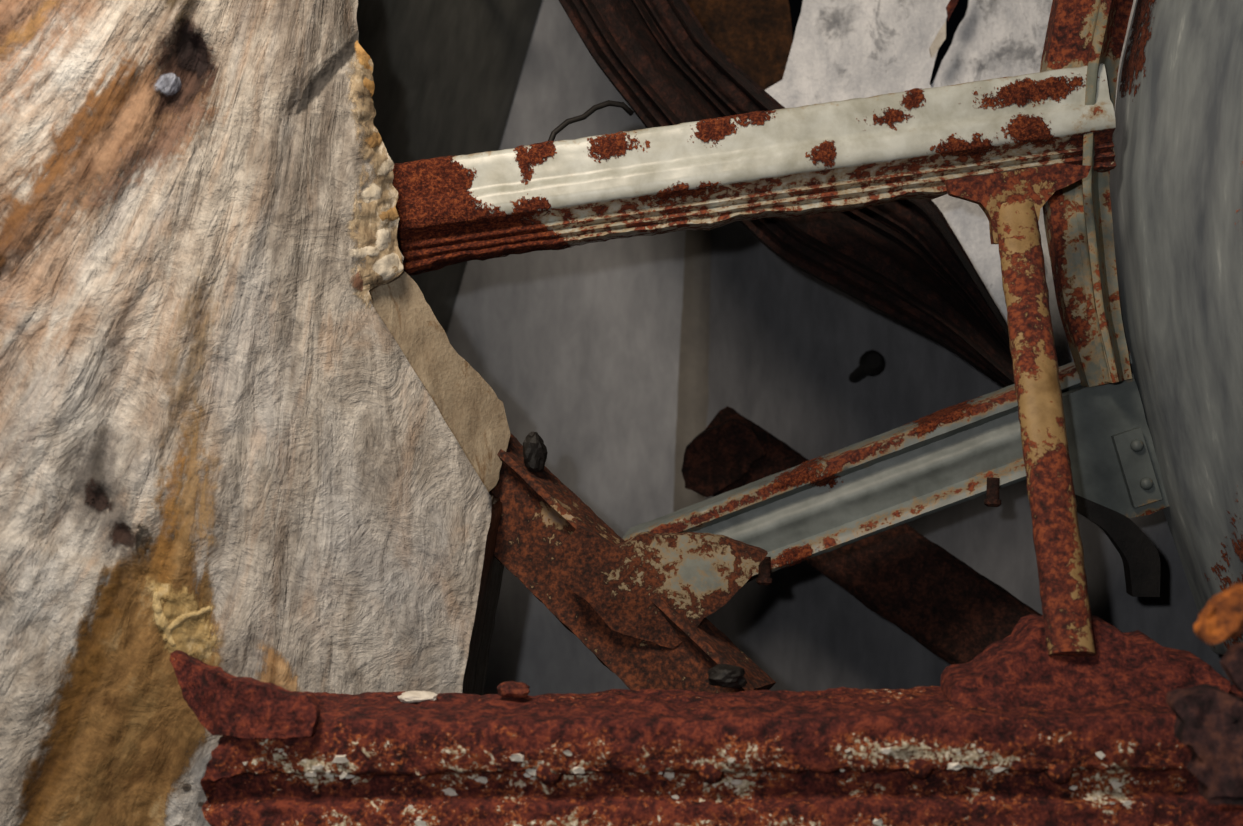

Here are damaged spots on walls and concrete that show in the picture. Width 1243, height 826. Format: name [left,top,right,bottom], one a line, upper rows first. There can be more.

corrosion [1119,0,1156,102]
corrosion [587,131,650,163]
corrosion [690,110,777,147]
corrosion [805,140,837,170]
corrosion [856,88,926,131]
corrosion [924,73,1103,160]
corrosion [392,141,571,276]
corrosion [624,181,723,212]
corrosion [899,396,980,435]
corrosion [759,454,843,492]
corrosion [774,542,820,568]
corrosion [258,645,297,691]